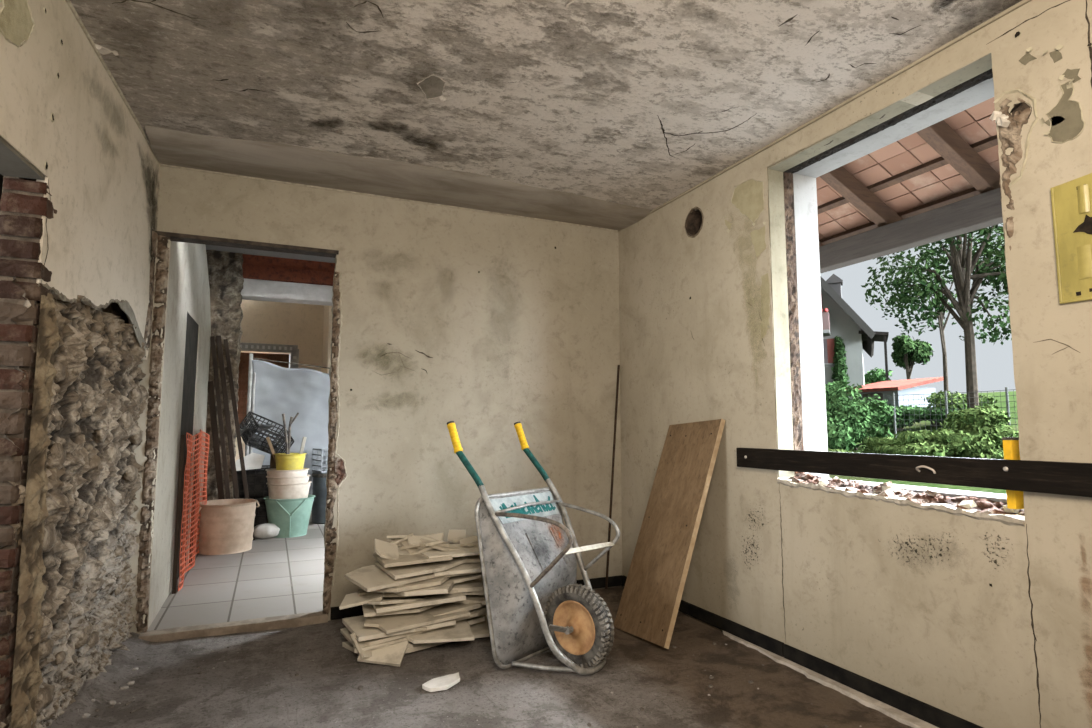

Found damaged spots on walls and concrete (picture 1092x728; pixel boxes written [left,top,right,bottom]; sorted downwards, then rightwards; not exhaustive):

peeling [0,0,35,48]
damp [957,0,1022,32]
damp [315,119,343,128]
damp [368,122,437,149]
spalling [989,43,1086,258]
spalling [783,68,993,451]
spalling [0,231,170,728]
spalling [777,472,1024,526]
damp [879,528,951,562]